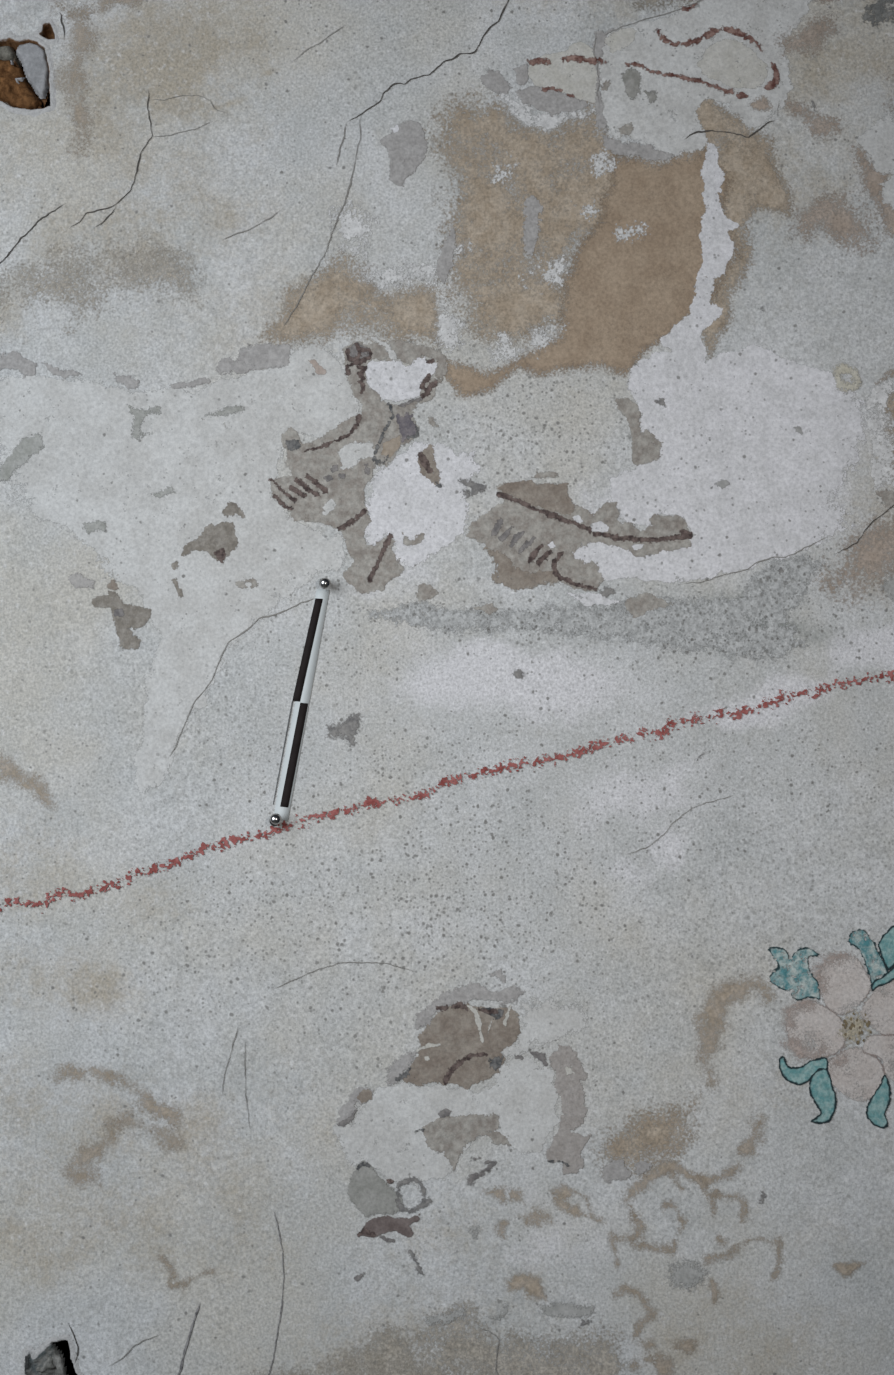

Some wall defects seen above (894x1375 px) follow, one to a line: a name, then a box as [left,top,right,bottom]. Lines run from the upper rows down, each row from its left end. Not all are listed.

spalling [0,18,59,117]
crack [0,92,223,263]
crack [284,0,509,325]
peeling [380,120,428,187]
peeling [479,28,675,179]
peeling [171,342,291,389]
peeling [268,305,567,594]
peeling [615,398,665,466]
peeling [171,502,245,598]
peeling [458,471,693,618]
peeling [336,969,592,1186]
spalling [18,1335,84,1375]